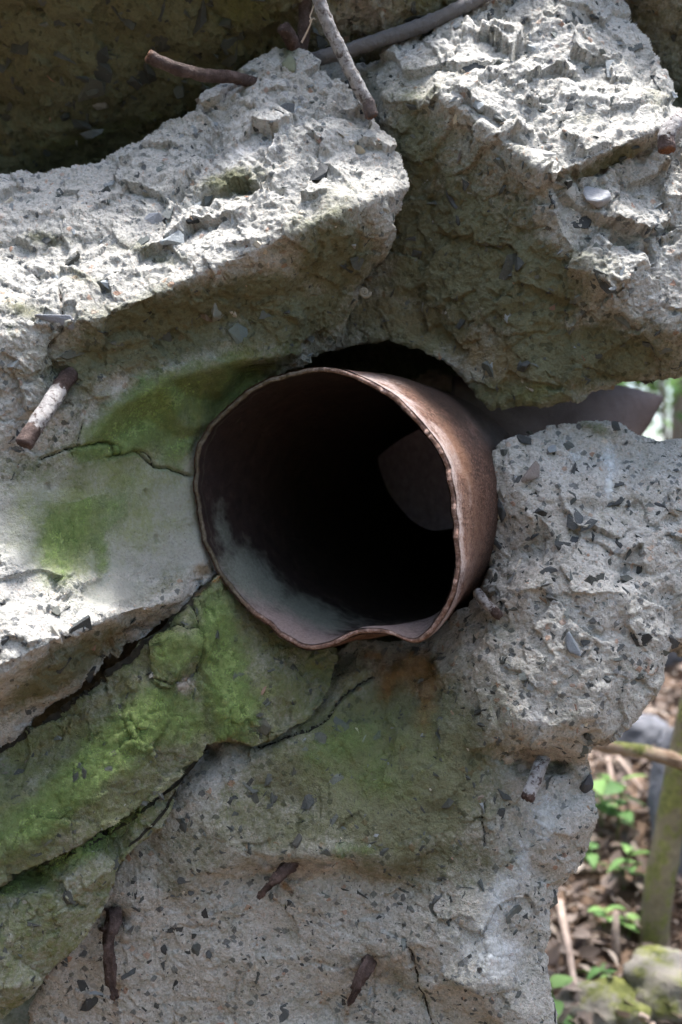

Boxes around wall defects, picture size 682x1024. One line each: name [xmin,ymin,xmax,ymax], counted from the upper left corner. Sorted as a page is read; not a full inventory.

spalling [77,149,213,266]
spalling [269,90,315,123]
spalling [296,115,330,192]
crack [41,426,187,476]
spalling [48,582,92,644]
crack [0,582,212,753]
leakage [119,682,259,744]
crack [258,677,371,748]
spalling [219,421,682,855]
crack [0,748,207,890]
spalling [46,743,331,1024]
spalling [383,711,610,1024]